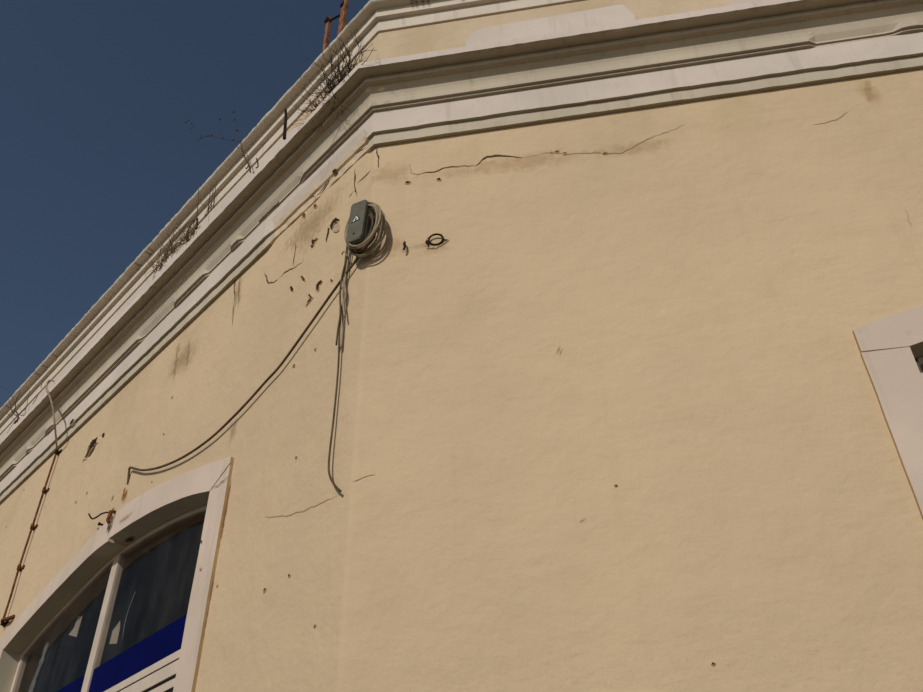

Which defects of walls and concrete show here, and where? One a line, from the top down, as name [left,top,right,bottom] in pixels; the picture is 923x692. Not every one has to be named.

crack [409,125,682,174]
spalling [310,218,341,248]
crack [264,242,304,284]
spalling [82,433,105,463]
crack [265,475,370,517]